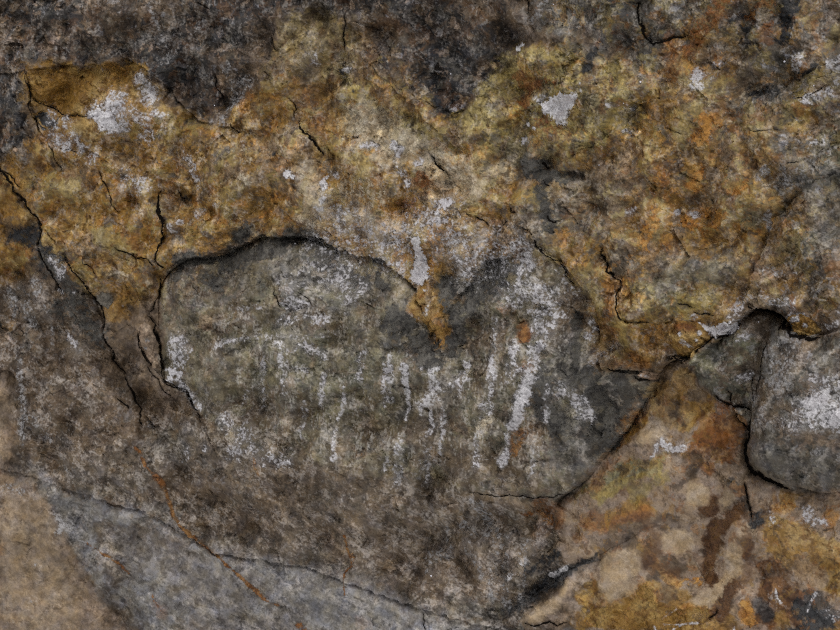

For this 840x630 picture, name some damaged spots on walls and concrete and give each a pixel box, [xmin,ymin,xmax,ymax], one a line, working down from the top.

crack [24,67,85,171]
crack [0,167,143,425]
crack [115,190,201,422]
water stain [165,335,202,410]
water stain [171,173,648,483]
water stain [519,156,578,234]
crack [669,334,729,362]
crack [716,306,820,518]